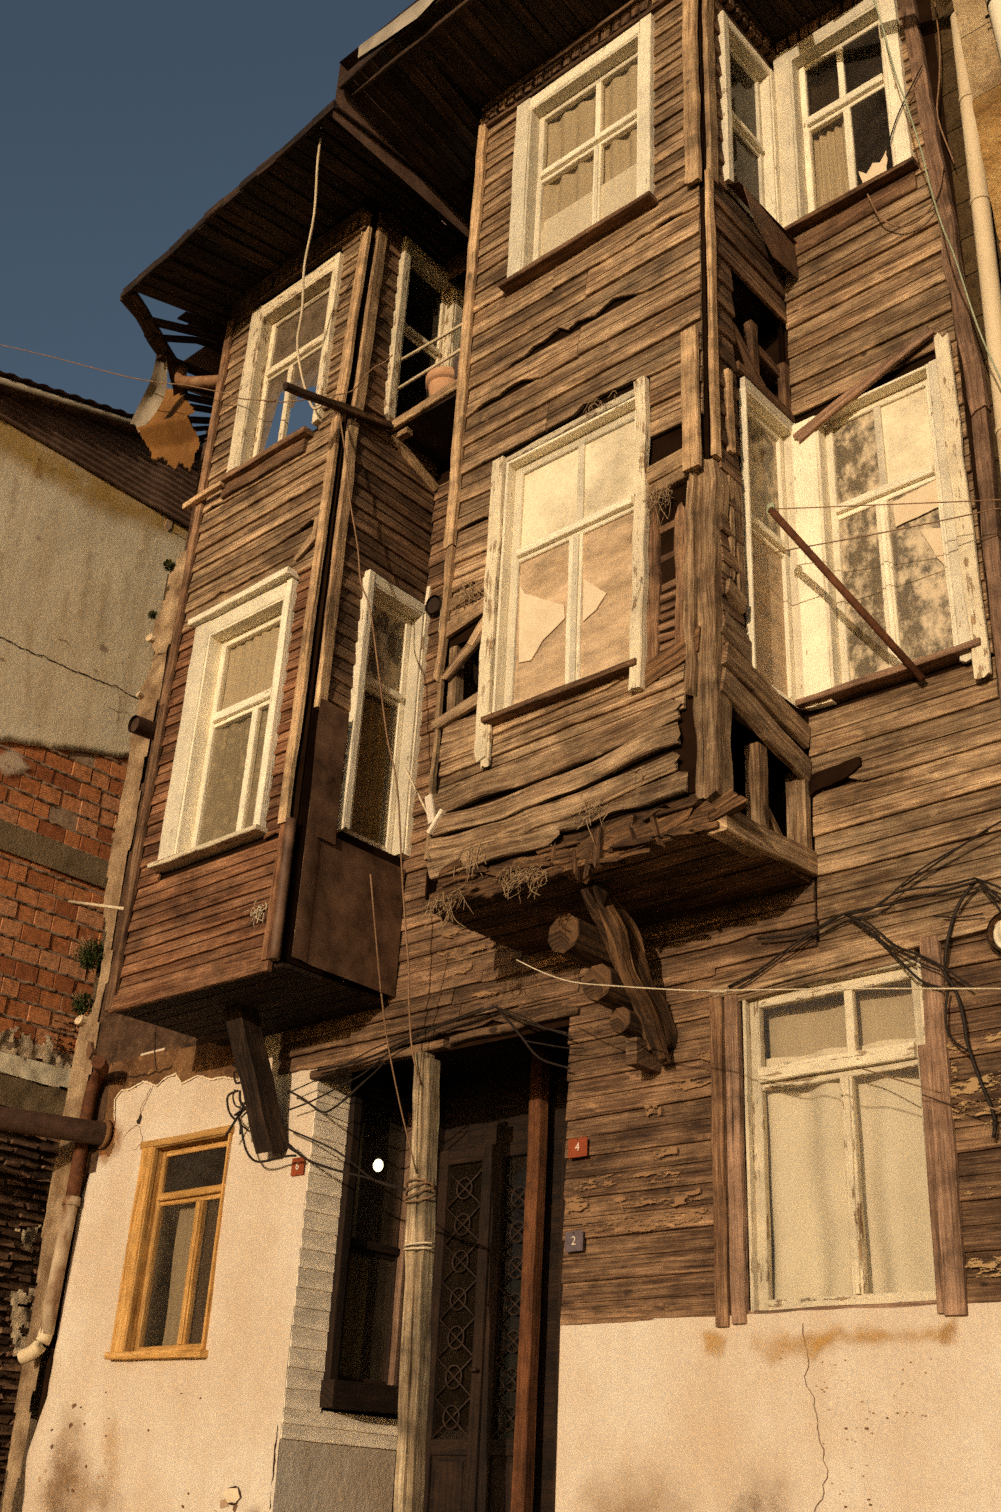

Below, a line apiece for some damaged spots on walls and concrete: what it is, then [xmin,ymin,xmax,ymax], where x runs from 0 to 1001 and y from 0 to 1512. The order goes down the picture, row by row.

peeling [644,1049,711,1117]
peeling [947,1031,1001,1131]
peeling [565,1146,709,1234]
peeling [965,1256,1001,1278]
crack [802,1323,828,1512]